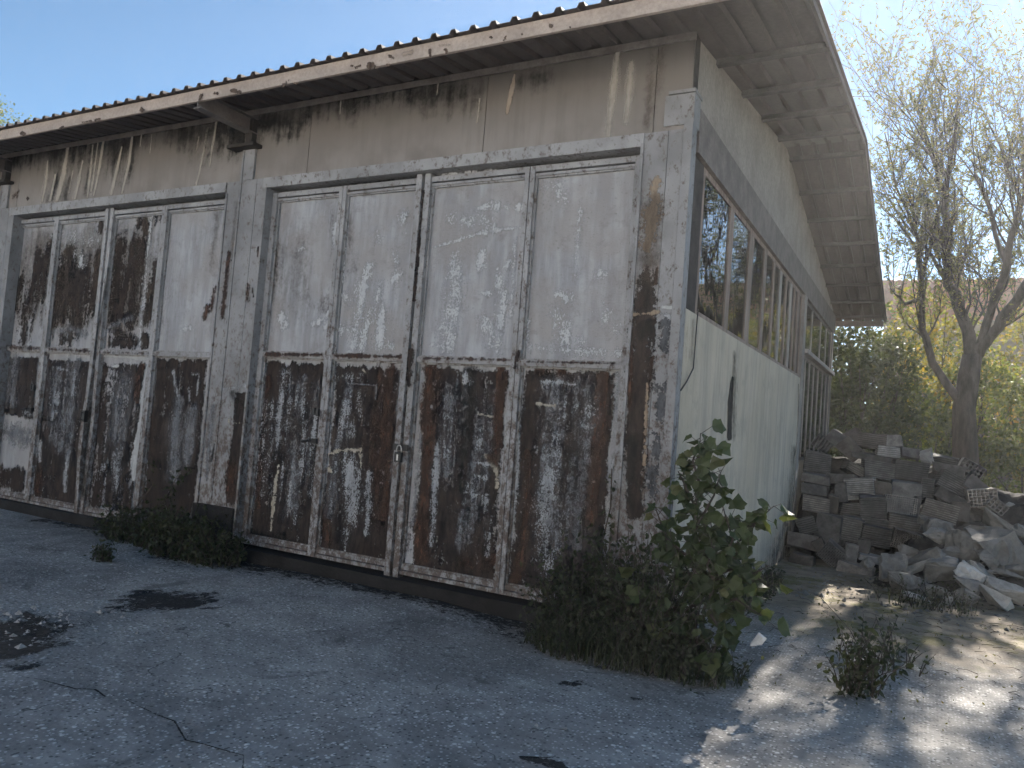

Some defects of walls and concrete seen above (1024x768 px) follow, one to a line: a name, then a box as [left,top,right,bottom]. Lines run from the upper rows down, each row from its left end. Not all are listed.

damp [606,52,634,137]
damp [41,141,105,202]
damp [110,135,152,196]
rust [180,251,232,333]
peeling [308,222,403,353]
peeling [428,200,523,358]
rust [0,215,215,522]
rust [220,175,665,592]
peeling [525,289,622,438]
damp [98,589,224,616]
crack [40,679,244,768]